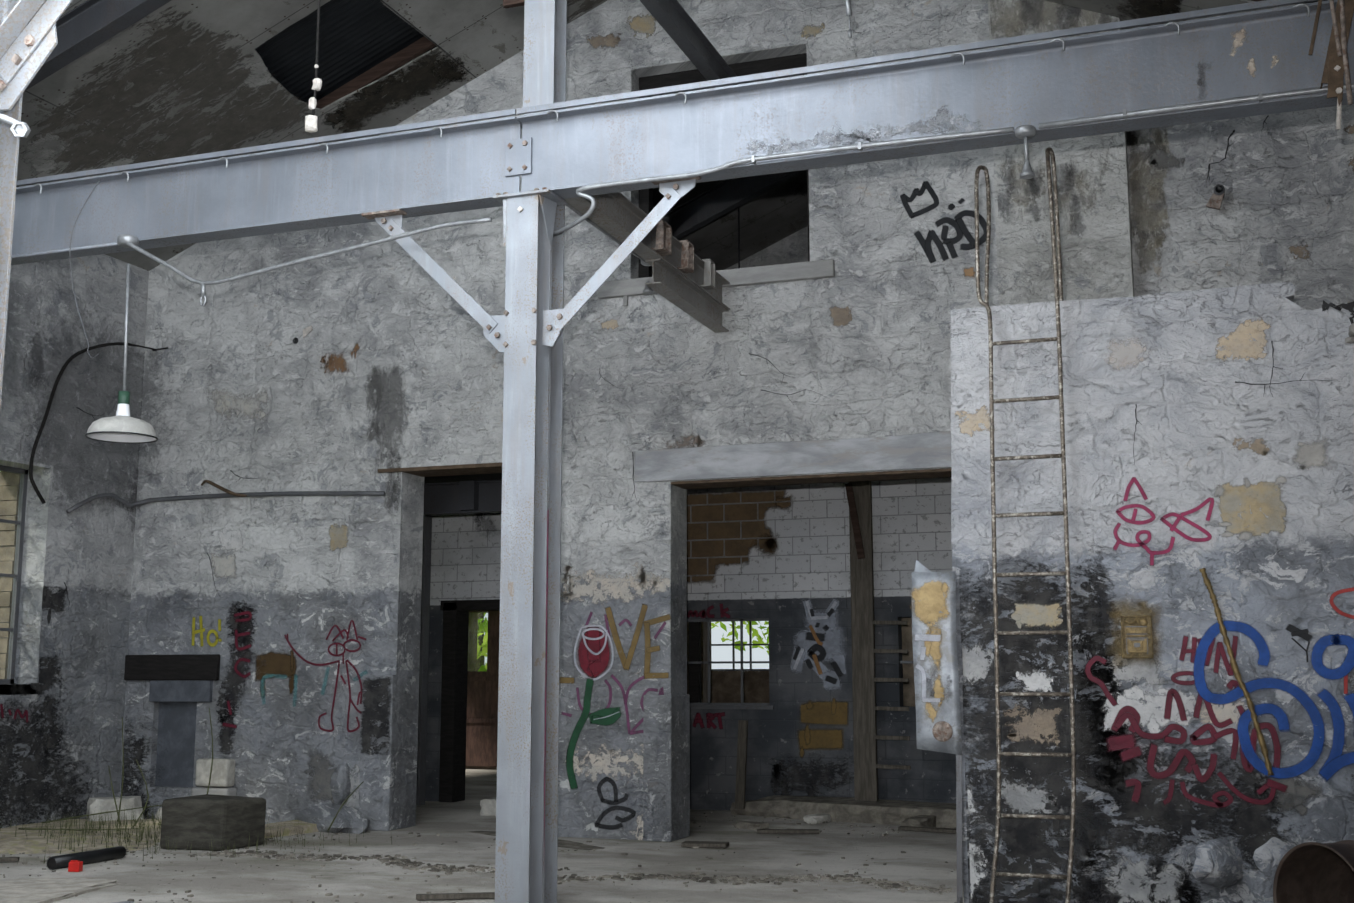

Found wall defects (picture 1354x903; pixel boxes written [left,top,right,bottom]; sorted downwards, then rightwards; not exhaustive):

damp [1107,0,1180,26]
crack [1322,300,1354,324]
spalling [1216,317,1271,361]
damp [368,367,403,509]
spalling [1233,438,1270,455]
spalling [1214,476,1286,540]